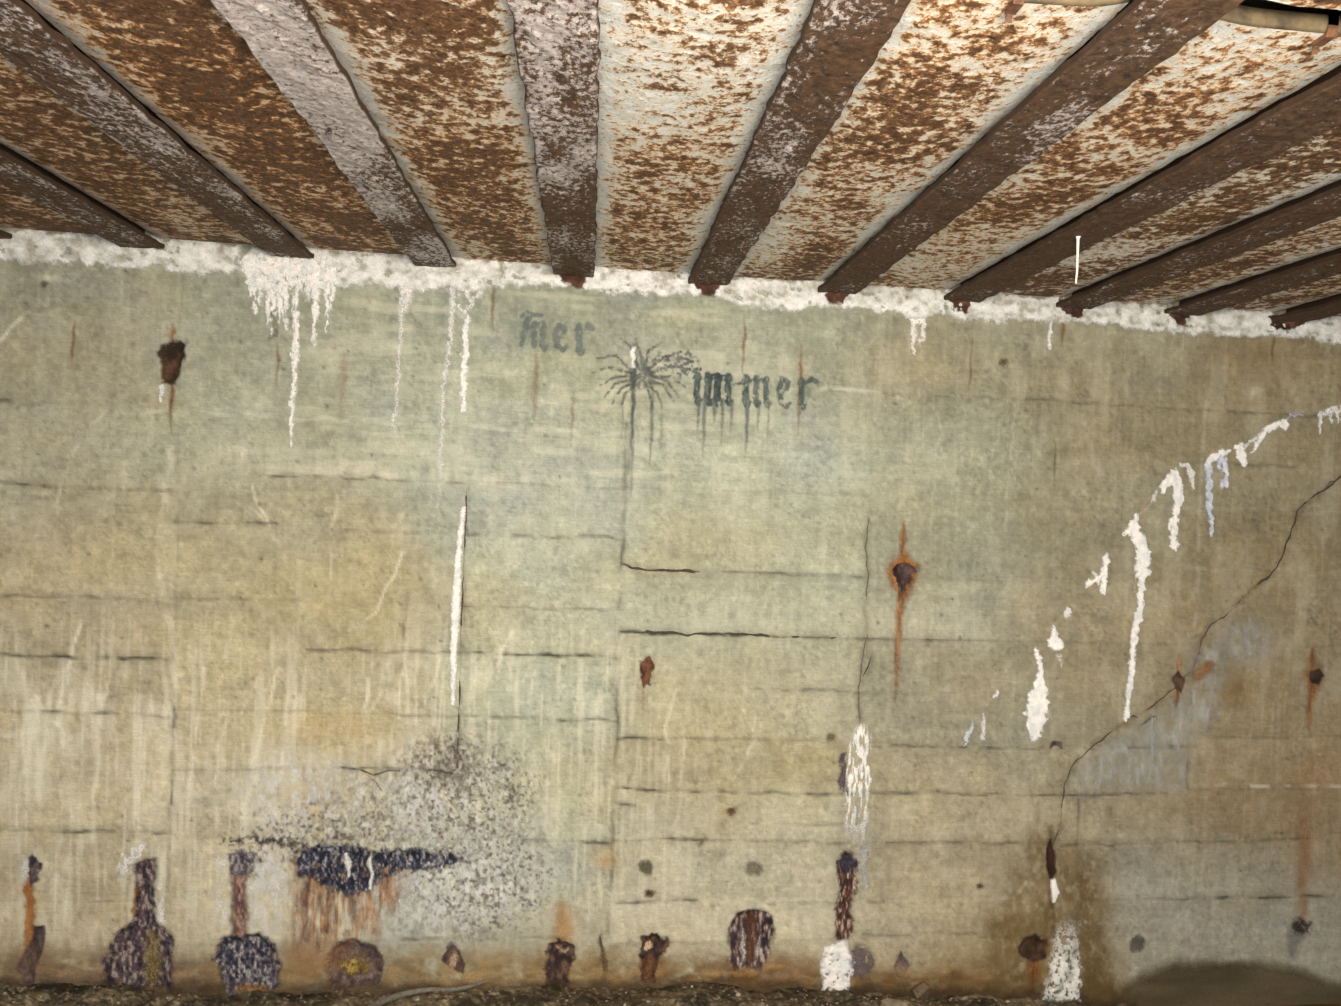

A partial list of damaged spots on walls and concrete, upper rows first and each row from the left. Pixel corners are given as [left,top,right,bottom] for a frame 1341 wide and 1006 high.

rust [560,275,586,288]
damp [0,229,1341,457]
rust [694,283,720,296]
rust [825,292,849,303]
rust [949,300,971,313]
damp [450,506,466,706]
damp [1023,607,1072,742]
crack [1052,476,1341,846]
damp [1122,413,1302,722]
spalling [101,843,174,991]
spalling [212,736,542,995]
spalling [728,909,774,971]